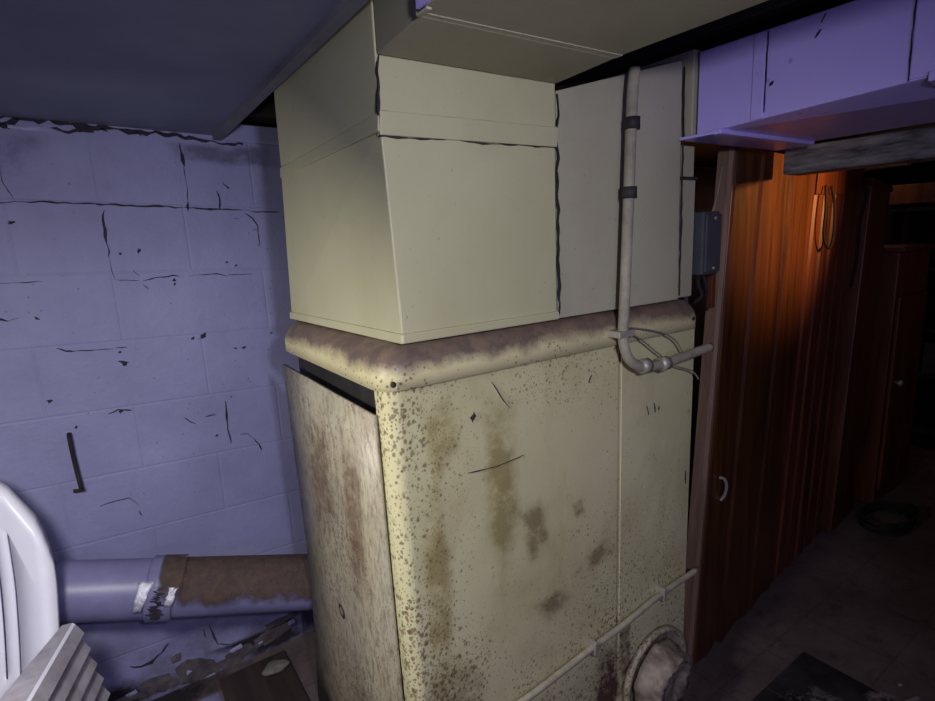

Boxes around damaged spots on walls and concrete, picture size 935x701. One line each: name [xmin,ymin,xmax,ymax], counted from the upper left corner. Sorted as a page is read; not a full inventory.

crack [0,116,277,288]
spalling [115,611,298,701]